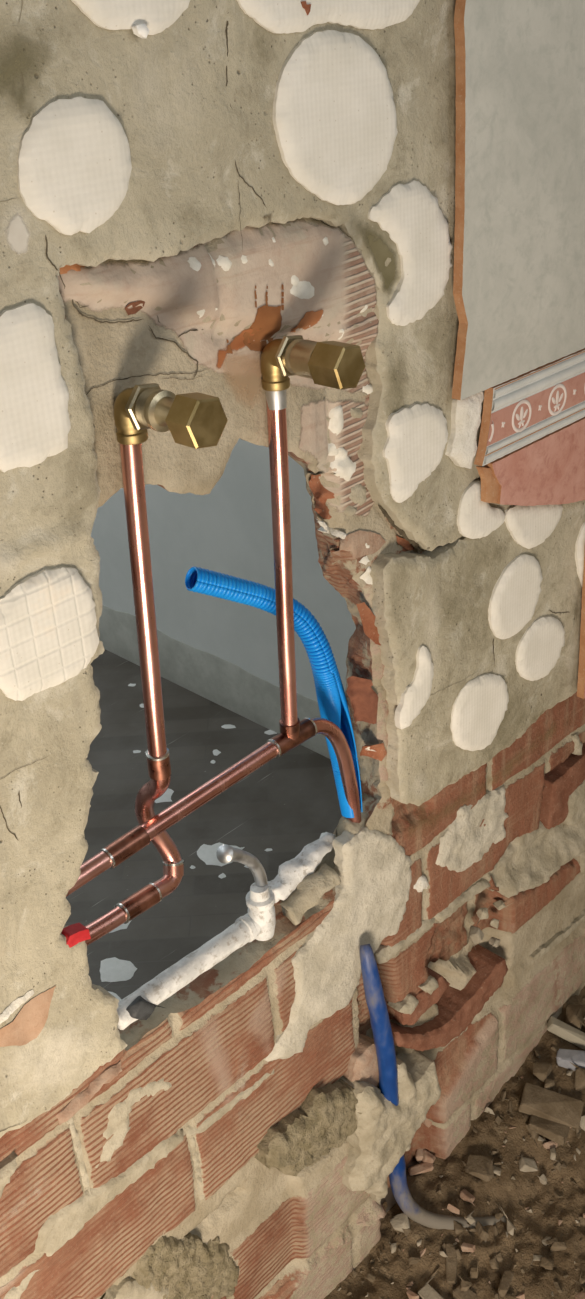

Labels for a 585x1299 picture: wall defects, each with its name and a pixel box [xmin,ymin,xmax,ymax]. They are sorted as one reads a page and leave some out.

rust [217,284,323,369]
spalling [57,220,414,585]
spalling [356,602,381,645]
spalling [346,676,378,724]
crack [0,756,48,840]
spalling [360,743,387,761]
spalling [539,743,585,829]
spalling [0,986,56,1047]
spalling [390,944,508,1051]
spalling [343,1034,379,1087]